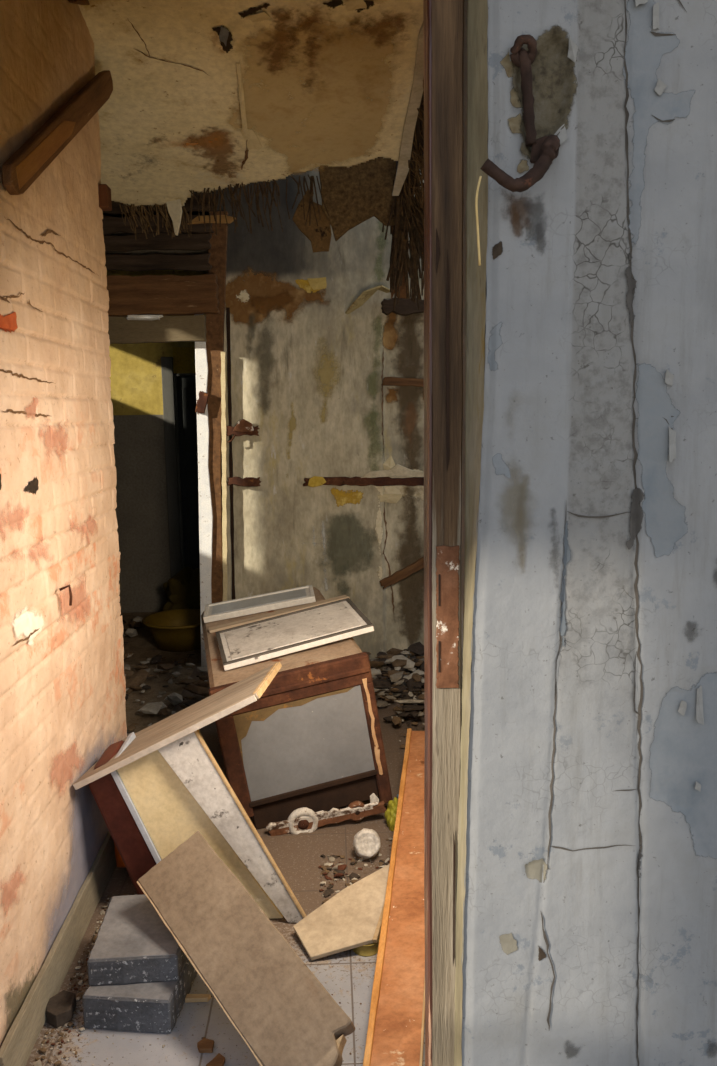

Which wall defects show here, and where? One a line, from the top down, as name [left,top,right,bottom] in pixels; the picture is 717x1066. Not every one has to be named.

water stain [183,130,237,178]
water stain [260,9,329,72]
peeling [623,0,695,244]
peeling [295,277,327,293]
water stain [314,516,373,595]
crack [541,0,676,1066]
peeling [635,363,688,558]
peeling [649,672,717,859]